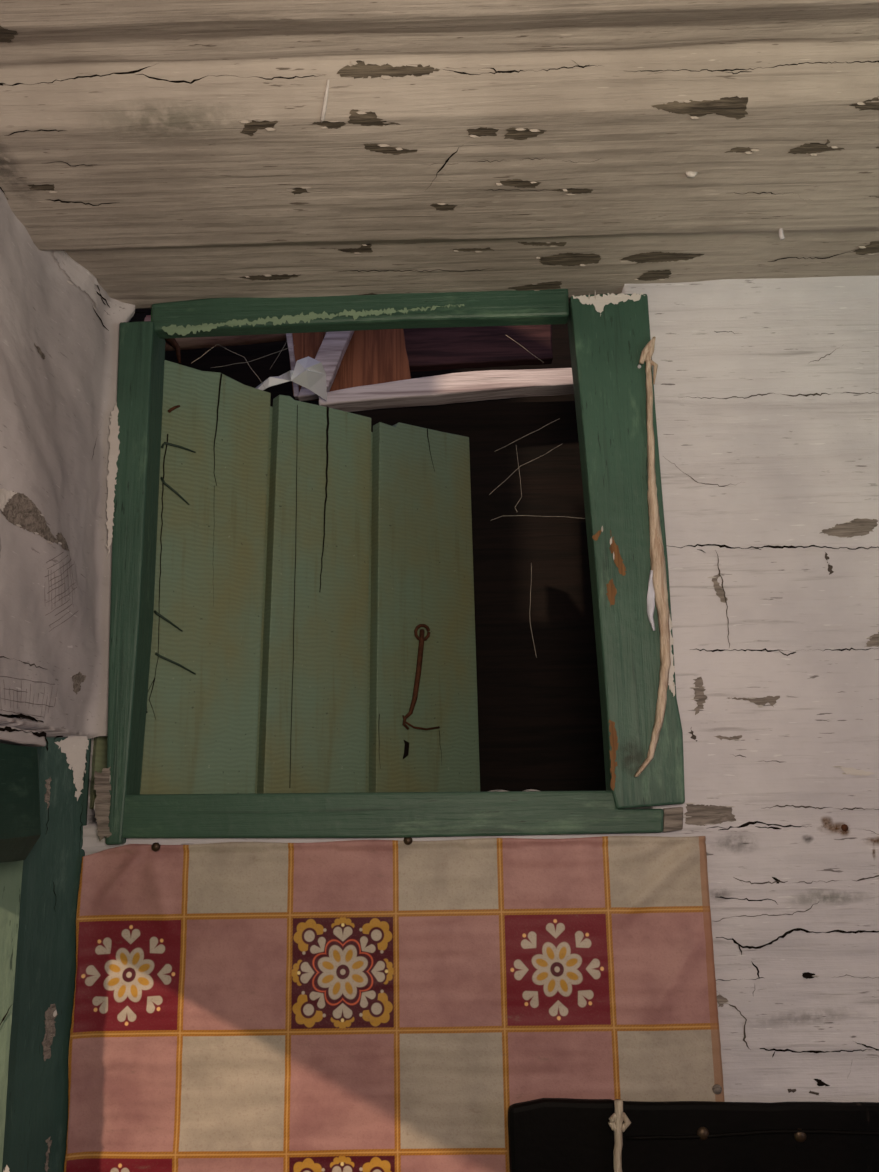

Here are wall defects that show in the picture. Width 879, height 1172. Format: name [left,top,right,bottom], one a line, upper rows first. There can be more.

crack [0,64,321,86]
peeling [337,60,440,79]
crack [443,60,879,75]
peeling [652,96,748,120]
crack [5,128,66,136]
crack [47,198,119,206]
peeling [0,488,69,551]
peeling [820,518,878,538]
crack [670,544,879,656]
crack [715,875,879,1079]